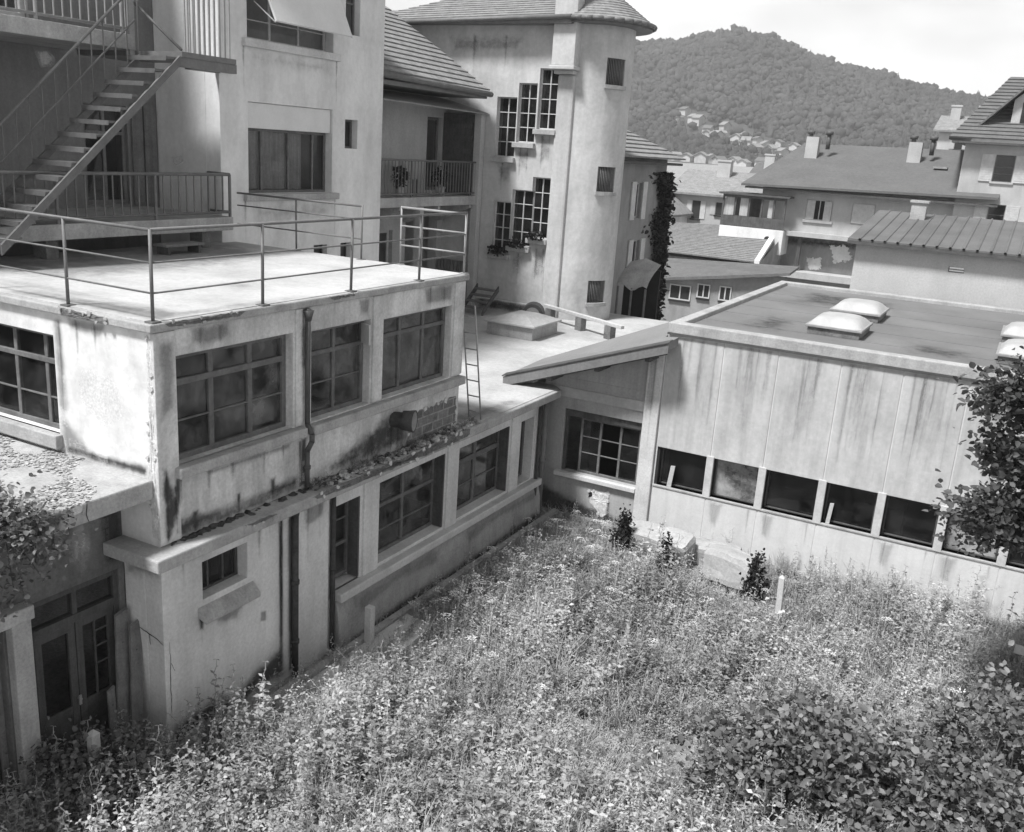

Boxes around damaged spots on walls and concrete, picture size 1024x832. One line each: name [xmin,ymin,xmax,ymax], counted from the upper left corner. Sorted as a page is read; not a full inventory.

peeling [806,245,852,270]
water stain [266,440,305,497]
water stain [165,474,255,539]